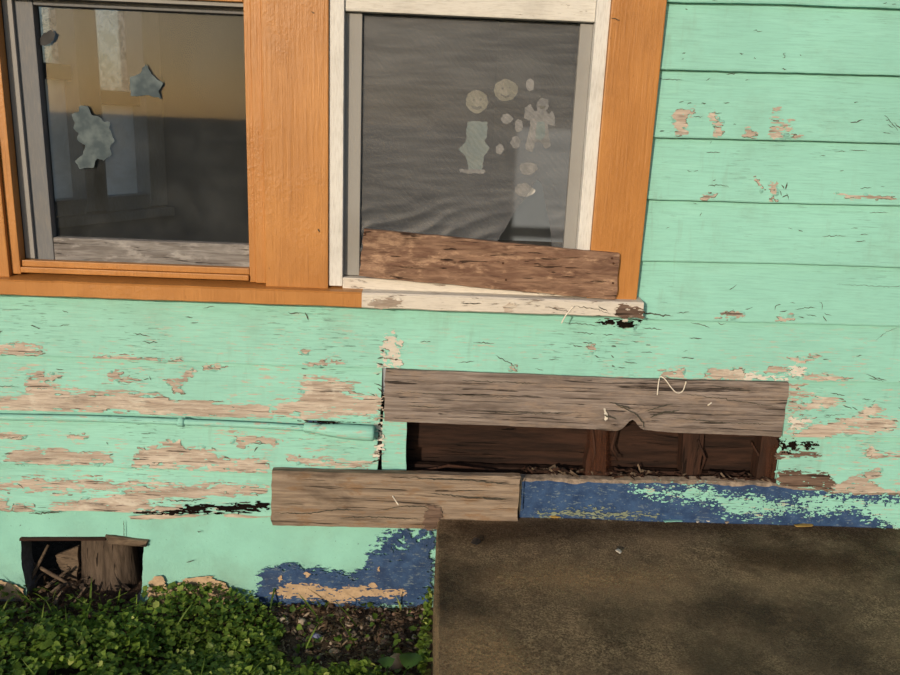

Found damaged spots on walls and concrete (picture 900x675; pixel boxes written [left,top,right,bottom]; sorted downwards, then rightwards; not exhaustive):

peeling [670,105,696,137]
peeling [707,109,725,137]
peeling [742,107,804,140]
peeling [753,176,780,202]
peeling [834,191,896,201]
peeling [368,297,403,310]
peeling [614,303,645,331]
peeling [0,341,48,356]
peeling [377,330,404,368]
peeling [0,349,386,520]
peeling [625,353,900,530]
peeling [254,528,436,609]